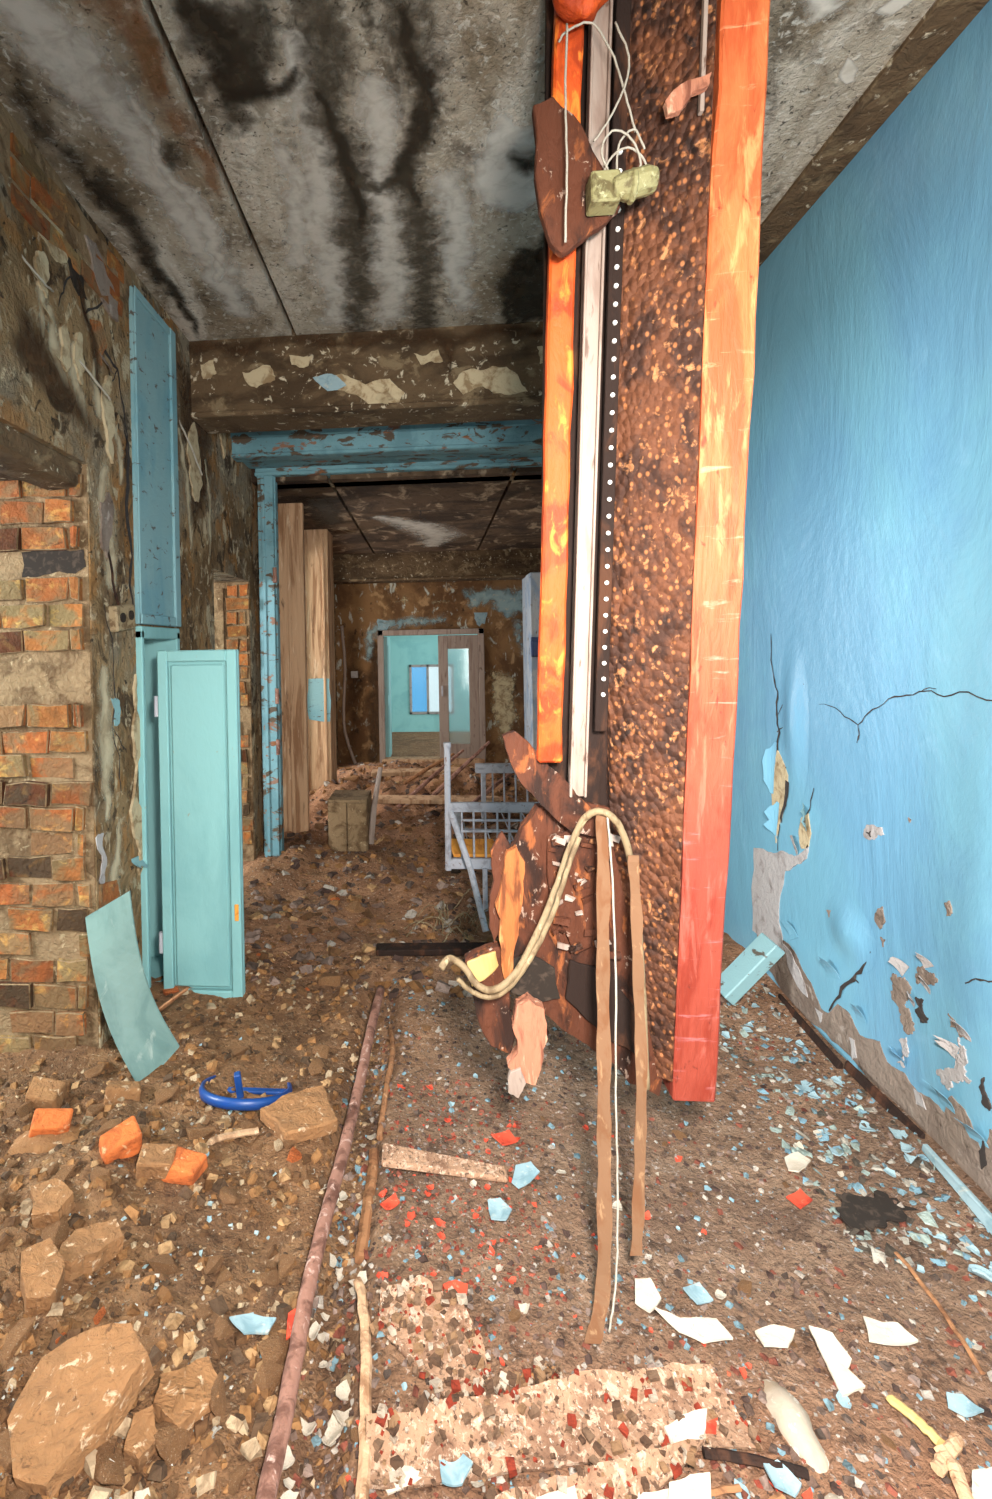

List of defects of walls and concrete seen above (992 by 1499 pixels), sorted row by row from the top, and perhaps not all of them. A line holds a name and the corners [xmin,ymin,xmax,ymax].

leakage [0,0,544,372]
leakage [15,287,87,424]
leakage [78,279,101,393]
peeling [242,365,275,388]
peeling [289,355,404,405]
peeling [453,366,528,395]
leakage [178,373,211,549]
leakage [374,516,455,547]
crack [770,641,992,851]
crack [829,952,871,1012]
peeling [751,741,992,1200]
flaking render [784,1152,813,1209]